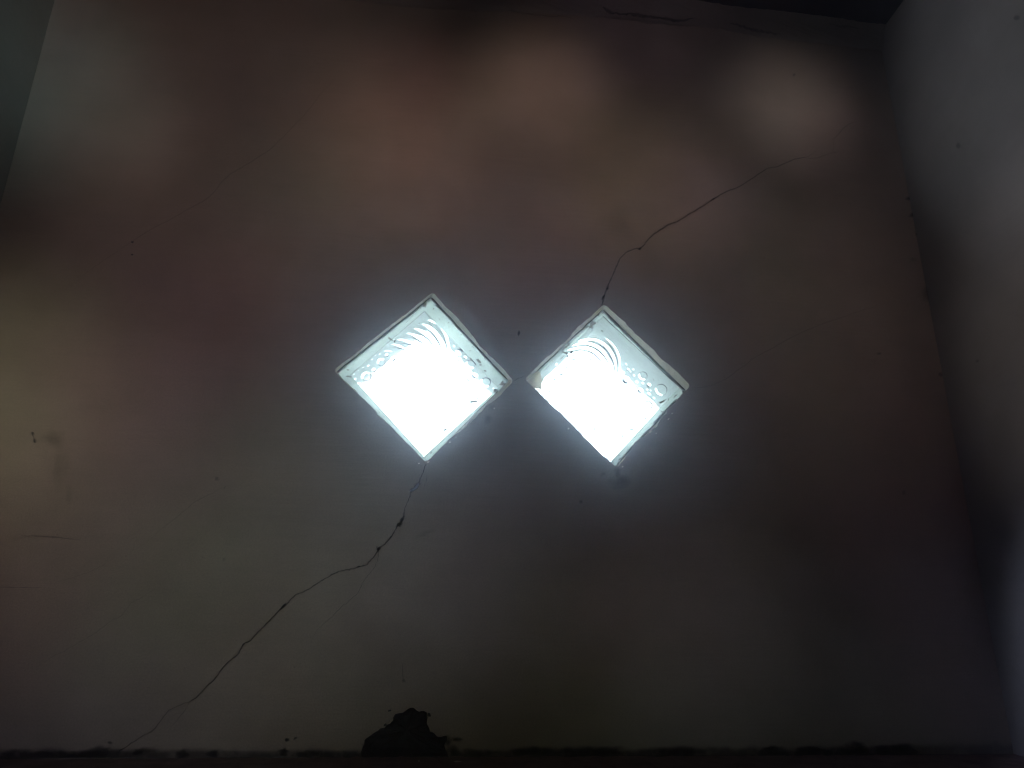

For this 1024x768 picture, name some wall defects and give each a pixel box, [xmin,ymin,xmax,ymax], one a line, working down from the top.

crack [601,125,848,305]
crack [125,464,426,748]
flaking render [361,708,462,762]